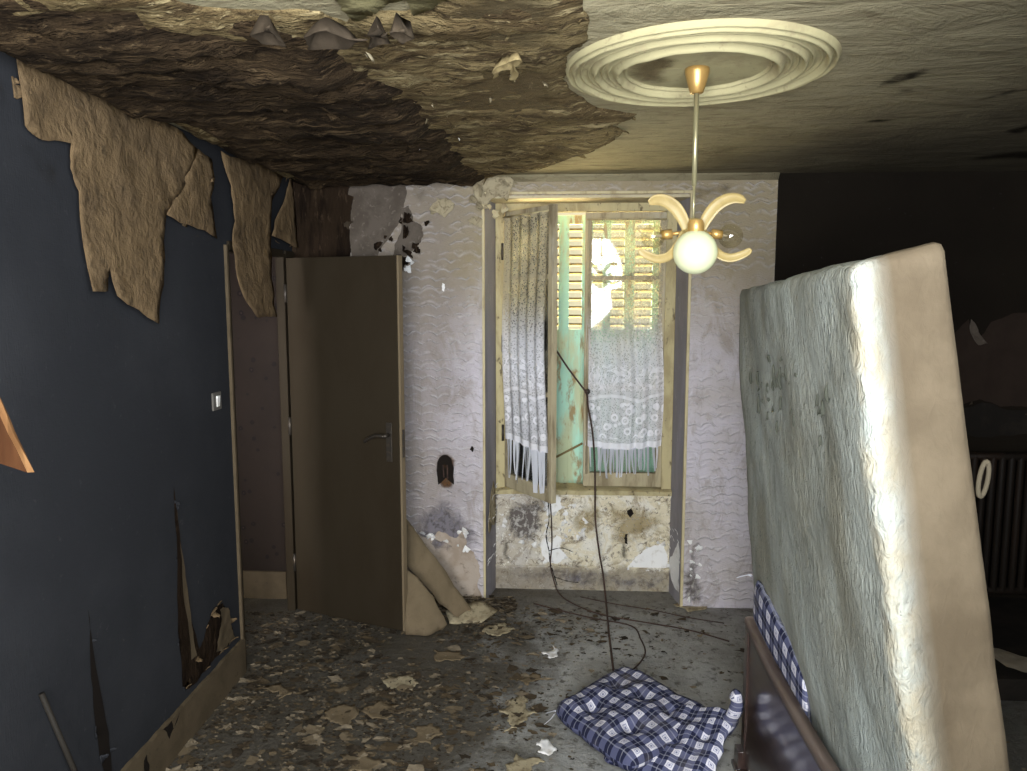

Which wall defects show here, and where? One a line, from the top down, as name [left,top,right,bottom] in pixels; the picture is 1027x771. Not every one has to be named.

spalling [0,0,522,273]
spalling [414,481,567,601]